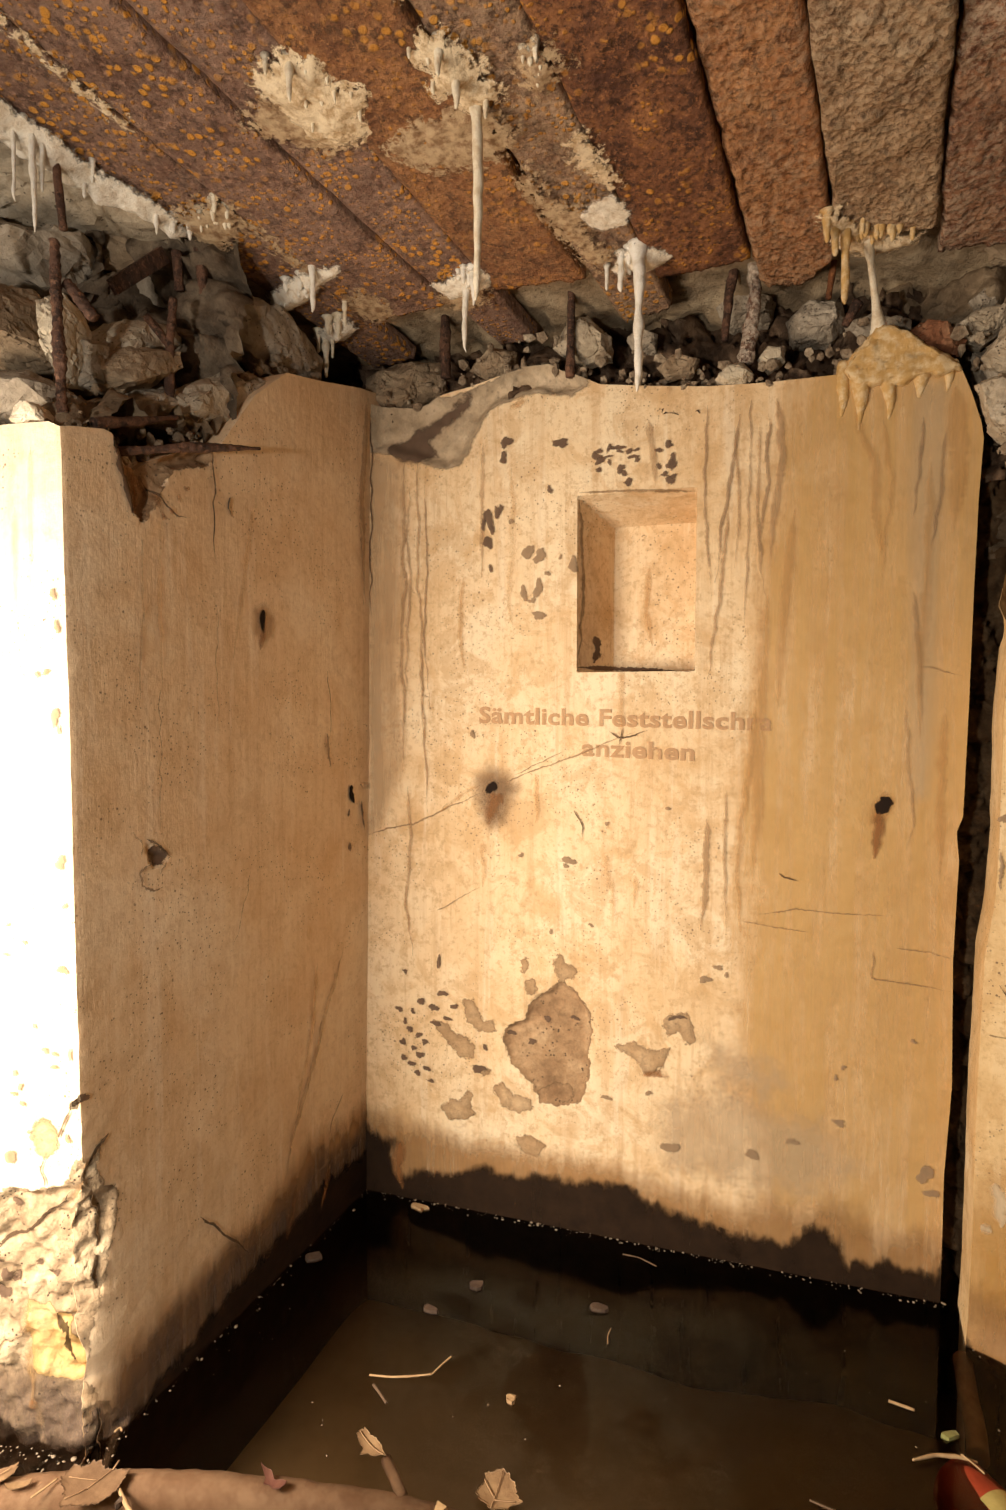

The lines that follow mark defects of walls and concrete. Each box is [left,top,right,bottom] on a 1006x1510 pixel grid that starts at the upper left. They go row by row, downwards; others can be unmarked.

leakage [9,400,55,423]
spalling [48,163,69,413]
leakage [0,10,140,134]
spalling [89,249,261,522]
leakage [0,100,398,378]
leakage [225,22,673,392]
spalling [370,291,589,469]
spalling [592,440,677,487]
leakage [744,199,984,1241]
spalling [0,1093,119,1467]
leakage [0,1109,942,1477]
leakage [965,1186,1006,1490]